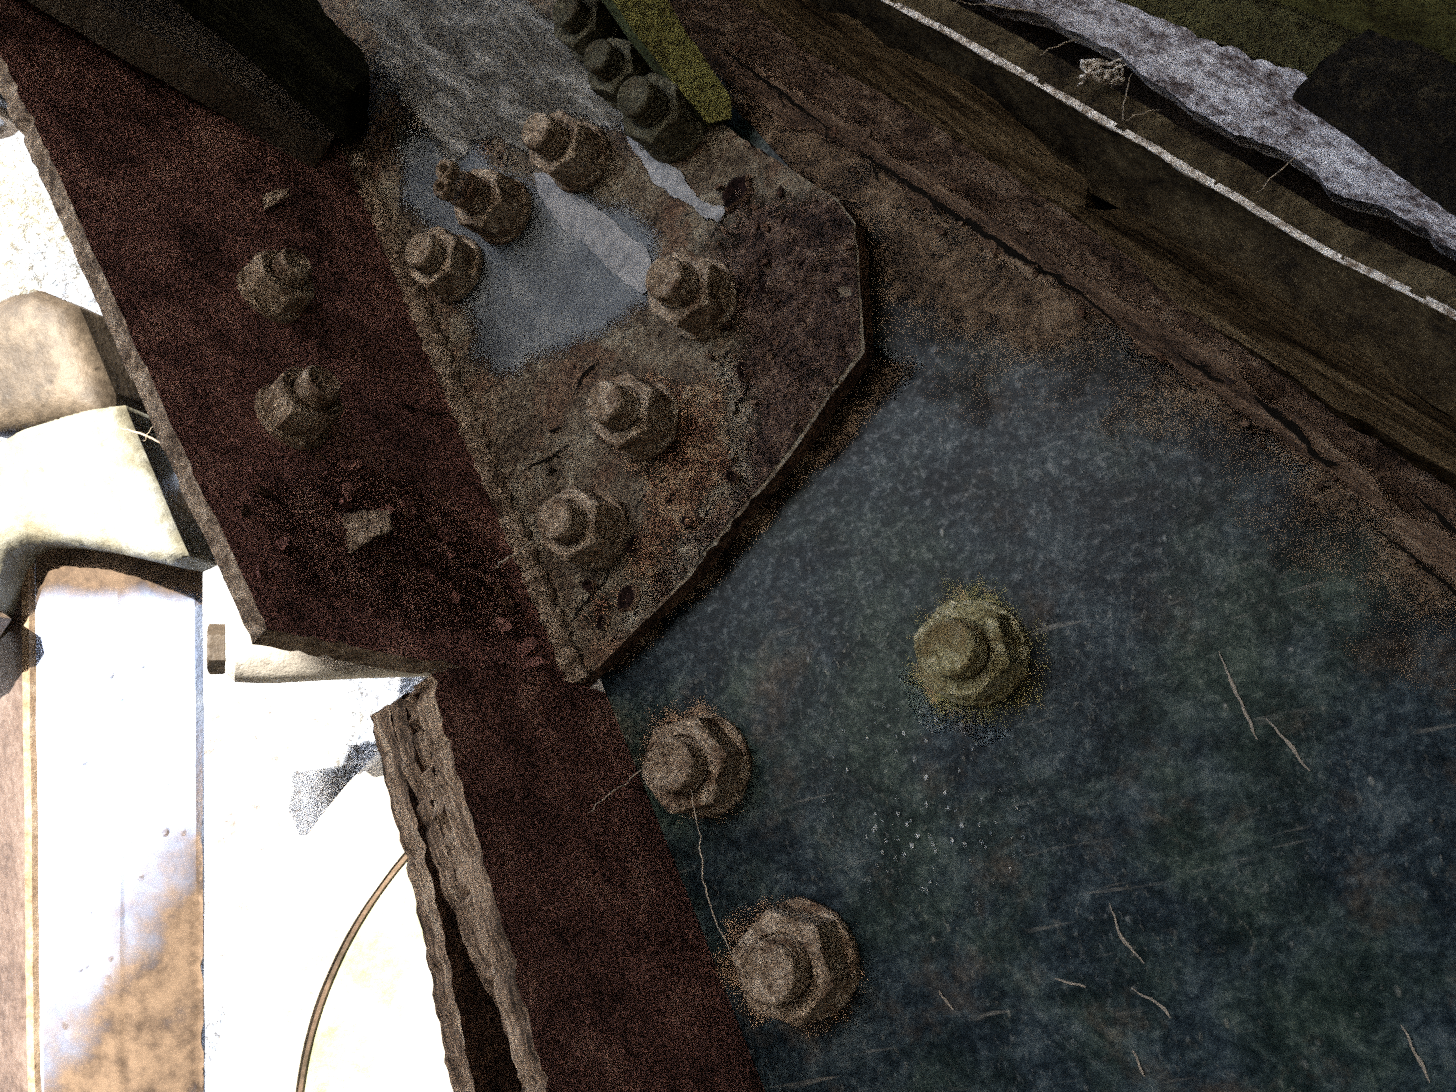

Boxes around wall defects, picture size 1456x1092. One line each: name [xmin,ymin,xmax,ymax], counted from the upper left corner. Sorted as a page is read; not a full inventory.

corrosion [591,17,1456,687]
corrosion [641,703,715,761]